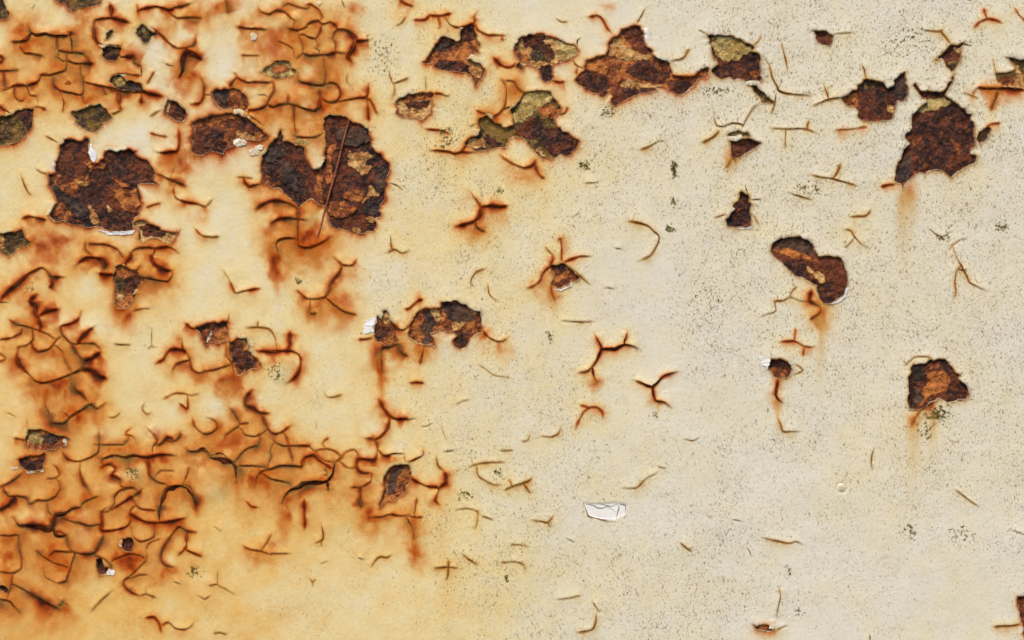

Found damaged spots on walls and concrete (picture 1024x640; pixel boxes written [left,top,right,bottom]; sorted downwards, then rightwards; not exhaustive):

corrosion [257,26,306,62]
peeling [463,18,774,162]
peeling [837,44,990,188]
peeling [44,98,179,248]
peeling [160,87,392,239]
corrosion [29,230,74,265]
corrosion [267,222,333,282]
peeling [766,232,851,305]
corrosion [113,305,137,325]
crack [0,0,638,635]
corrosion [33,376,86,425]
peeling [907,359,974,410]